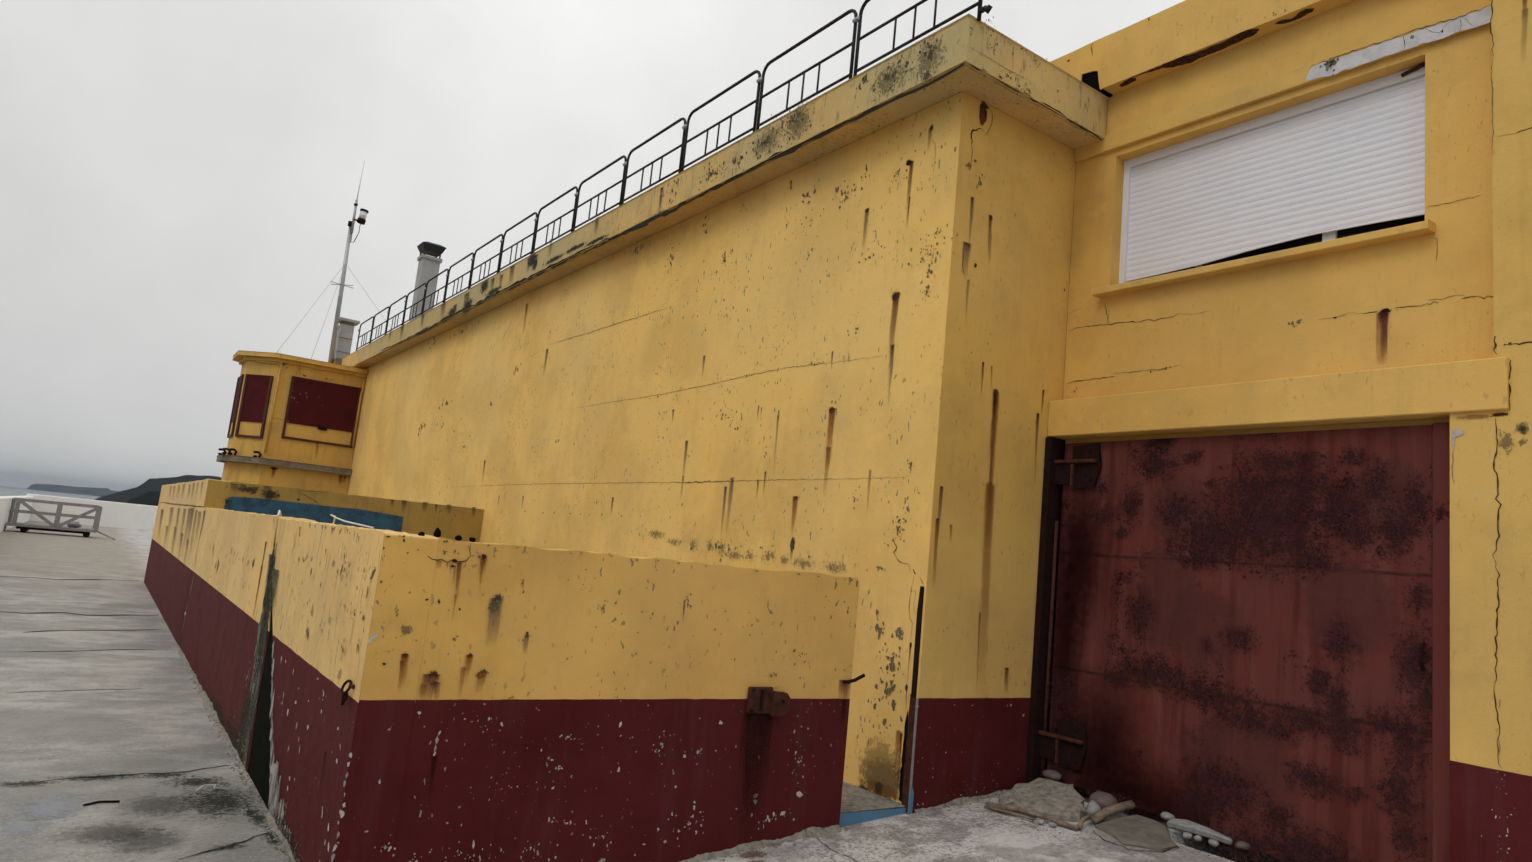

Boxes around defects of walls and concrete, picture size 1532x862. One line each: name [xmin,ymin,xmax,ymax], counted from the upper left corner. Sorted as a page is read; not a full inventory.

mould [856,31,949,92]
spalling [1305,6,1491,81]
corrosion [890,292,900,371]
crack [1396,295,1493,308]
corrosion [826,407,835,462]
corrosion [982,362,999,466]
corrosion [985,484,994,546]
crack [1493,336,1532,767]
corrosion [421,671,440,692]
peeling [431,731,441,778]
peeling [380,806,558,862]
corrosion [1205,824,1288,862]